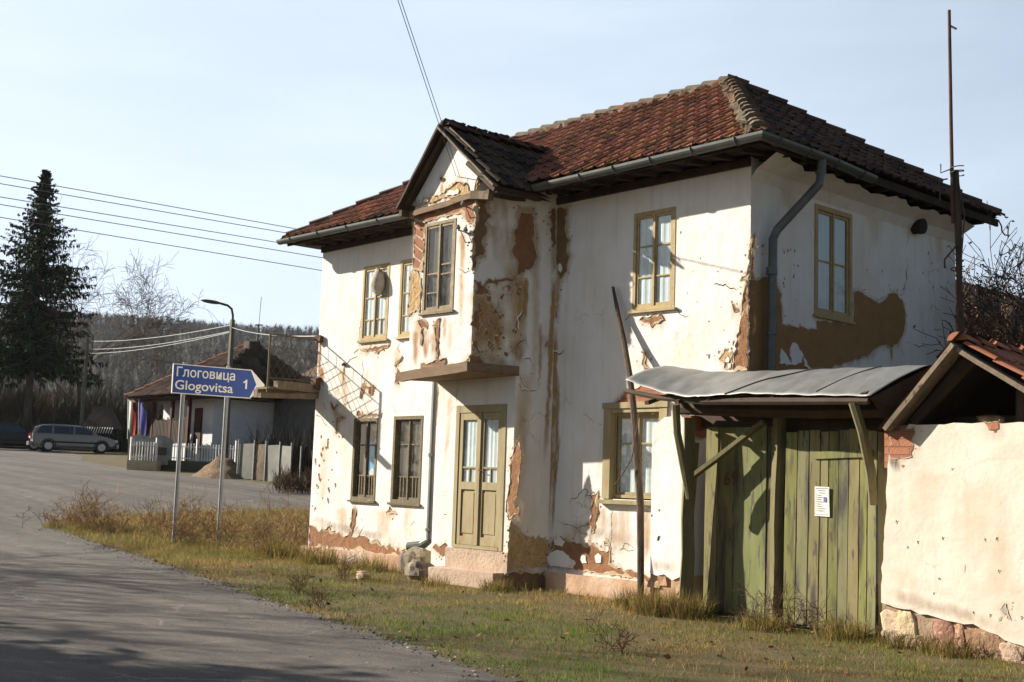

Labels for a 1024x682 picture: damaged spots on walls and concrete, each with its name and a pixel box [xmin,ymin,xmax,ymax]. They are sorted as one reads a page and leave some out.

peeling [407,176,573,368]
peeling [639,311,664,328]
peeling [706,234,907,372]
peeling [312,381,383,511]
flaking render [884,427,922,468]
peeling [308,507,407,556]
peeling [502,439,650,590]